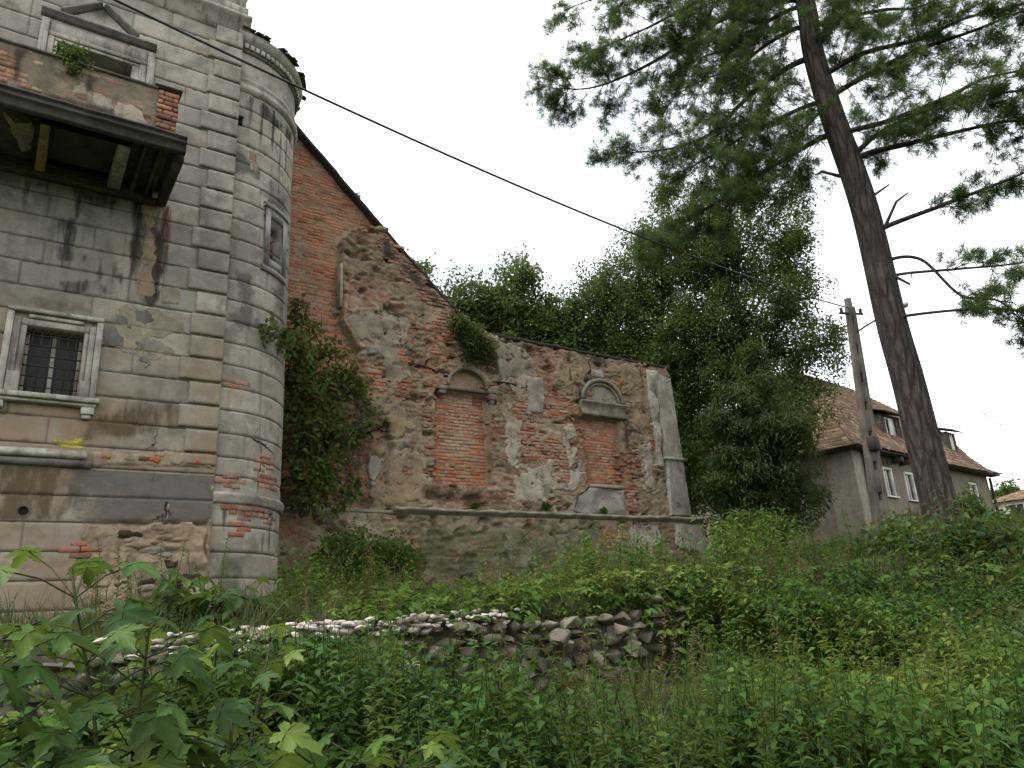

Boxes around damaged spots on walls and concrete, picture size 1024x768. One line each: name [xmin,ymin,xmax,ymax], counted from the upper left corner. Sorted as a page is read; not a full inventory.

leakage [250,98,291,168]
leakage [61,189,116,260]
leakage [120,202,164,305]
flaking render [103,204,186,368]
leakage [236,152,284,265]
spalling [58,520,213,624]
crack [147,428,171,523]
flaking render [211,454,277,494]
flaking render [220,505,276,537]
crack [250,437,274,490]
flaking render [332,263,437,507]
flaking render [491,335,664,512]